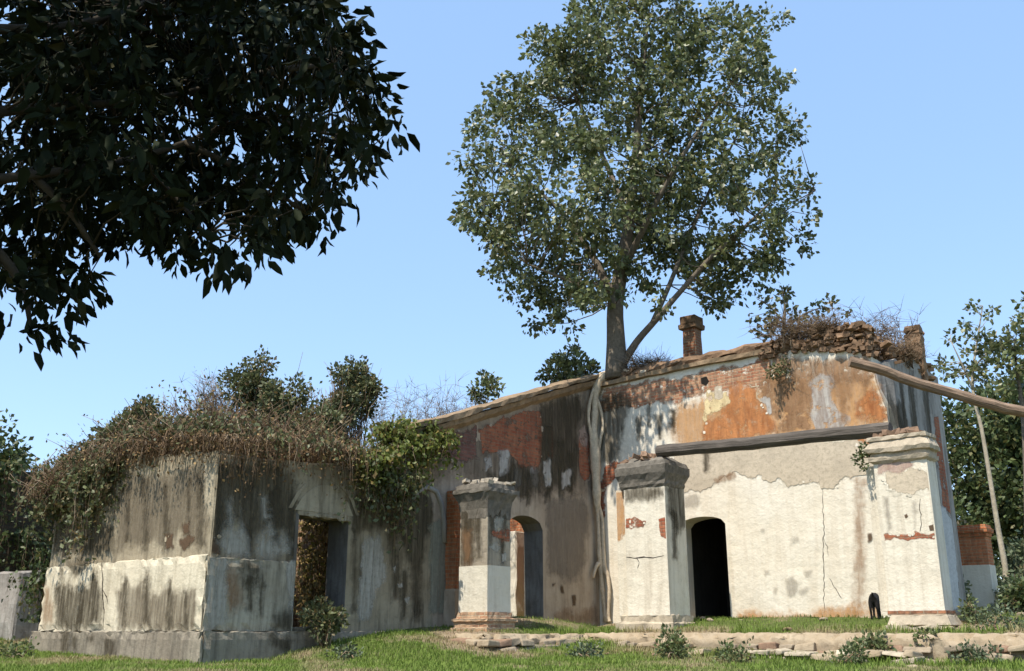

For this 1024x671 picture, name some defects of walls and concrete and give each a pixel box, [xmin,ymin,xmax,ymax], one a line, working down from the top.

leakage [54,459,296,656]
leakage [438,396,588,580]
flaking render [462,411,656,541]
flaking render [600,358,951,514]
crack [822,490,841,611]
flaking render [884,524,935,541]